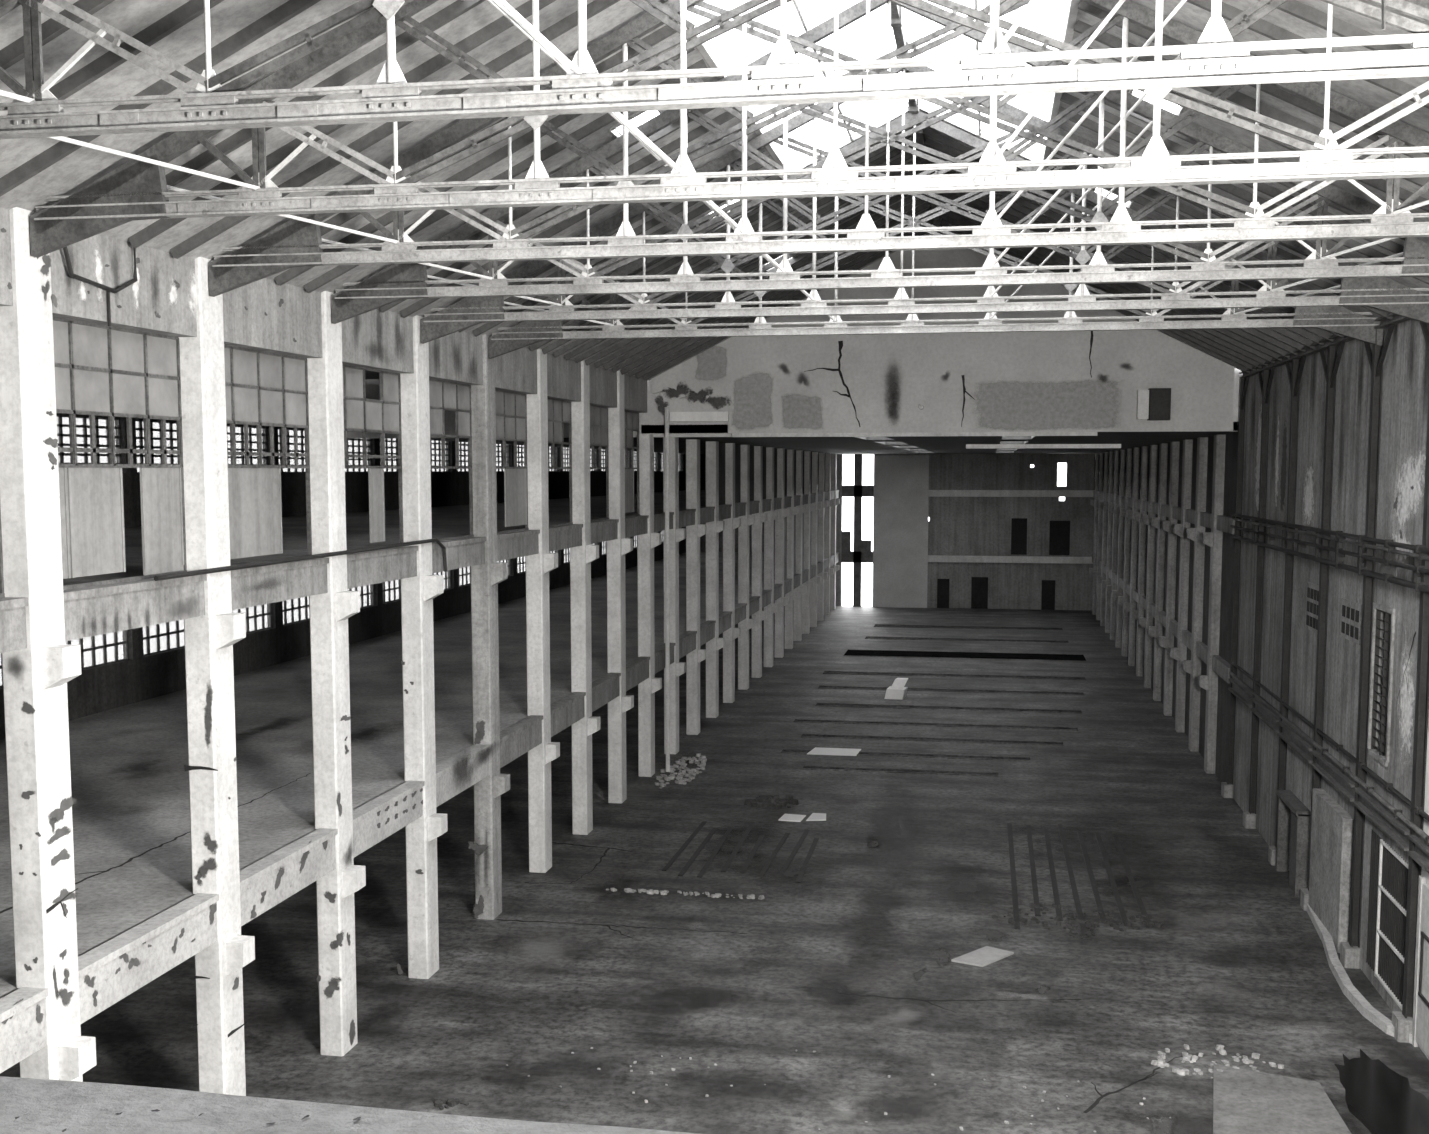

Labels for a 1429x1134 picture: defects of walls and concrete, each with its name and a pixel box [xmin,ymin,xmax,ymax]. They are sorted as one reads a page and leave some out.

crack [804,341,860,427]
damp [887,369,899,419]